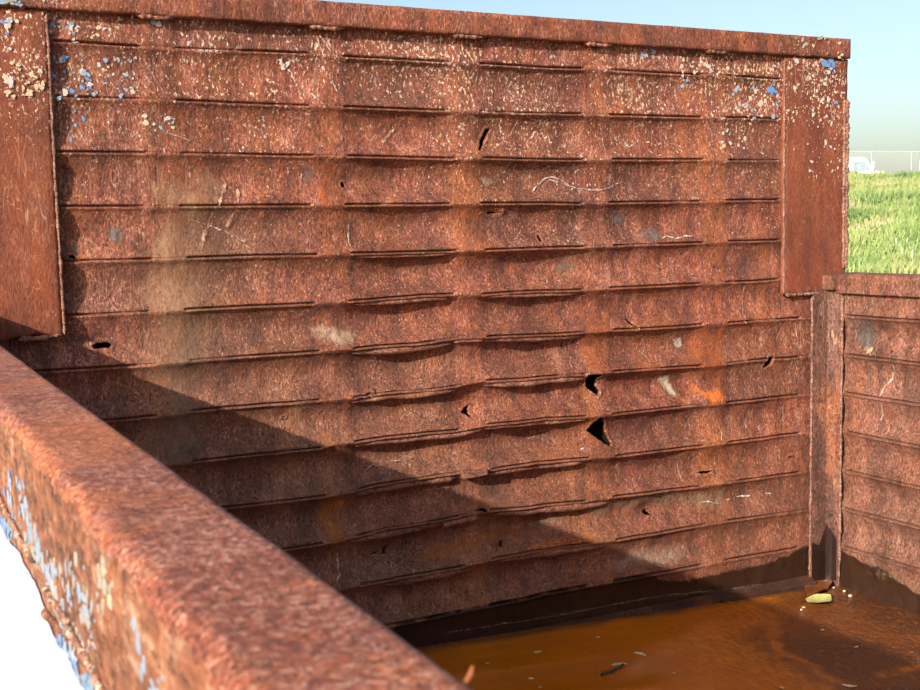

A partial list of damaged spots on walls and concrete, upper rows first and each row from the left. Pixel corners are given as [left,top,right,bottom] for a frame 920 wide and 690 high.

peeling [1,17,19,34]
peeling [43,0,112,43]
peeling [3,54,137,101]
peeling [720,36,844,178]
corrosion [695,388,723,404]
peeling [0,468,113,690]
damp [392,525,920,648]
peeling [130,617,163,690]